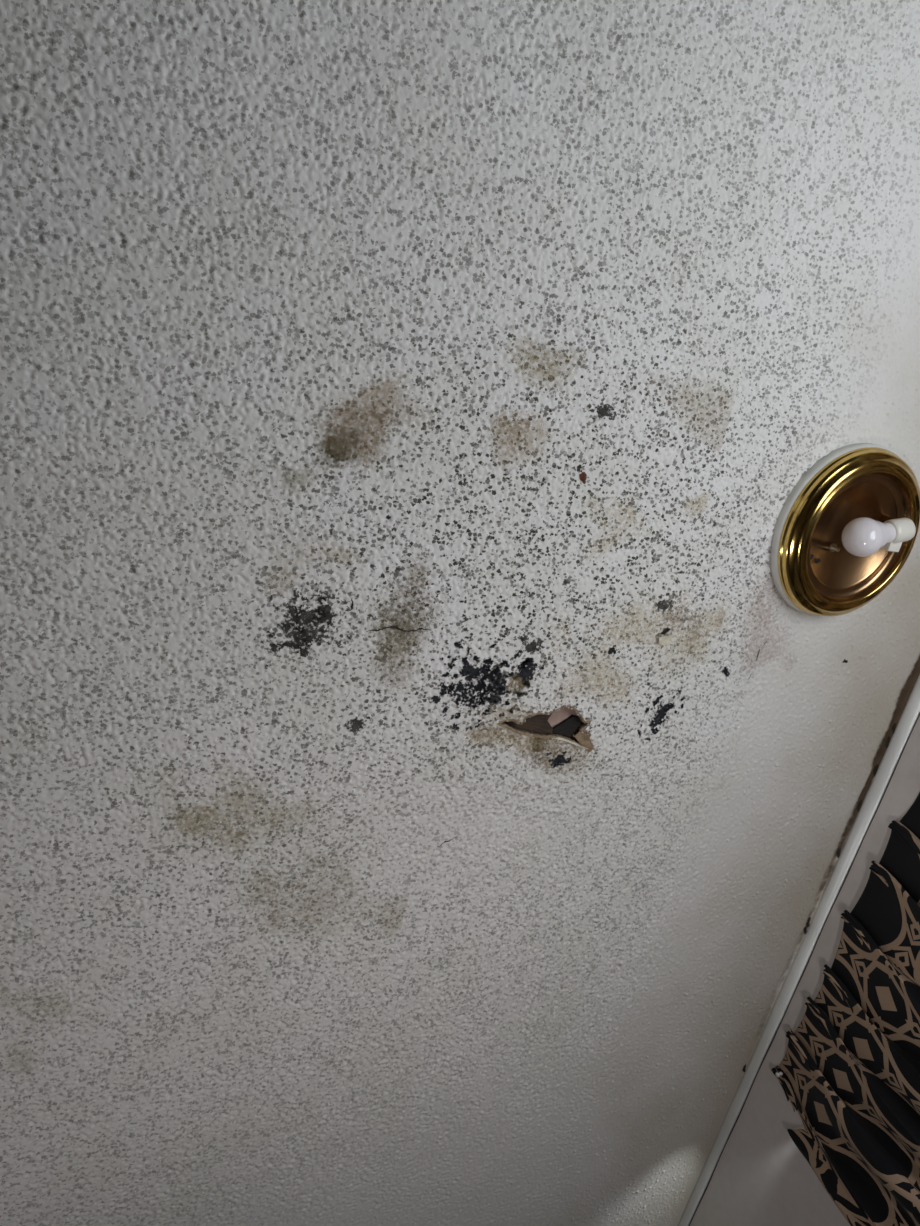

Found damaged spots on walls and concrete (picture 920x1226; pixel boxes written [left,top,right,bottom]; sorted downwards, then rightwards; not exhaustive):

mould [254,577,357,670]
mould [429,633,544,730]
mould [631,689,685,741]